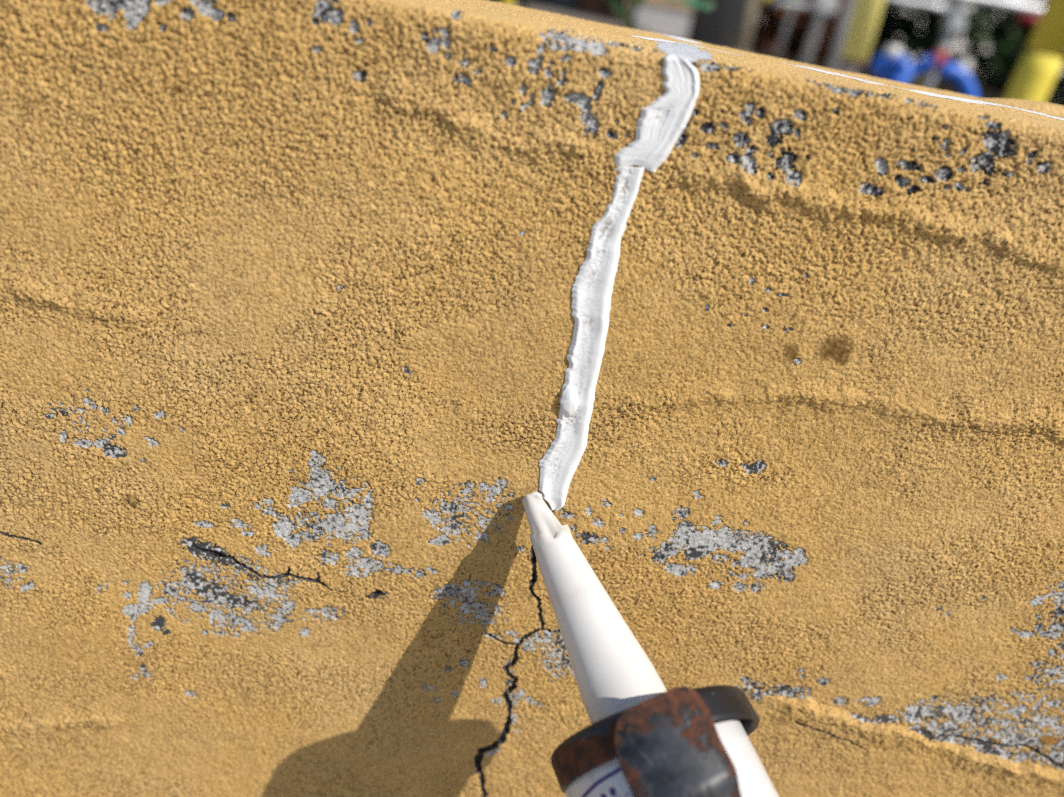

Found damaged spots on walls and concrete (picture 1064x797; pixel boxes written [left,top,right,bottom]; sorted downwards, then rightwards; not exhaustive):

flaking render [85,0,171,32]
flaking render [180,0,236,22]
flaking render [675,102,810,187]
flaking render [859,114,1052,198]
crack [0,531,42,545]
flaking render [122,450,438,682]
crack [194,546,388,599]
flaking render [415,477,514,547]
flaking render [560,490,808,593]
crack [475,535,561,797]
flaking render [736,668,830,702]
flaking render [832,572,1064,771]